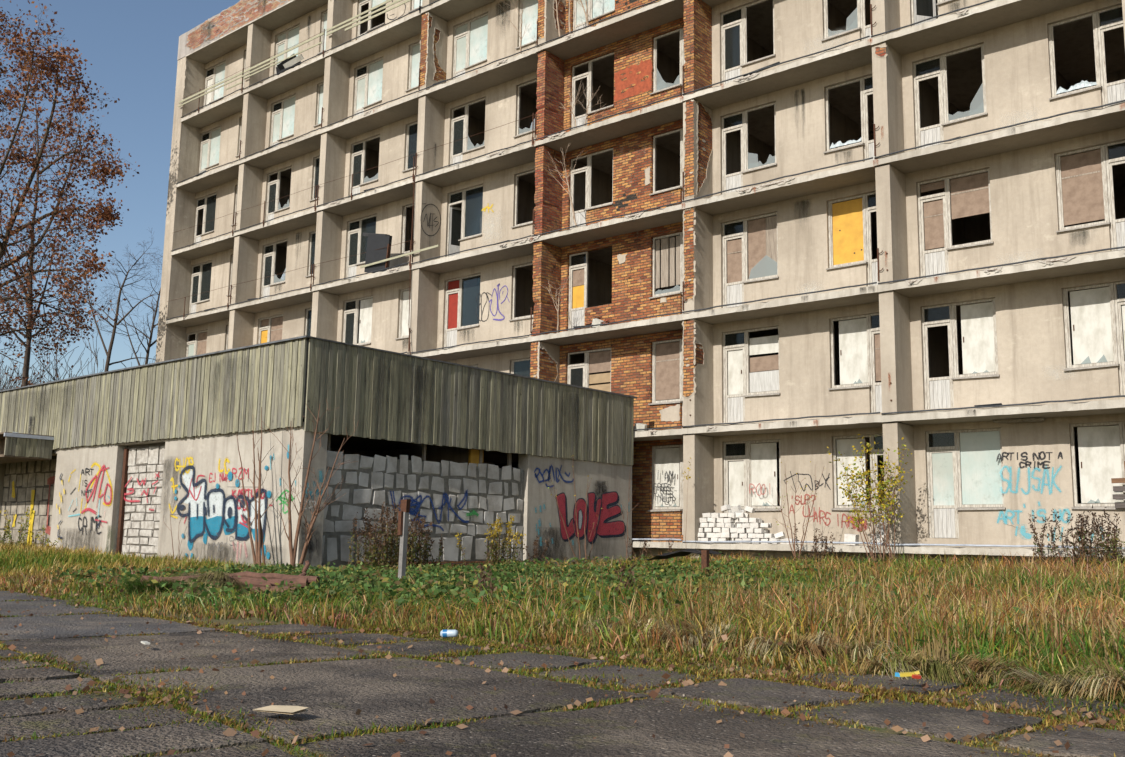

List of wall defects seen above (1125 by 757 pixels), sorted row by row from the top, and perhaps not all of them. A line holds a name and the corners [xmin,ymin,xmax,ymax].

peeling [177,0,291,107]
peeling [418,12,446,88]
peeling [536,0,574,41]
peeling [614,59,653,101]